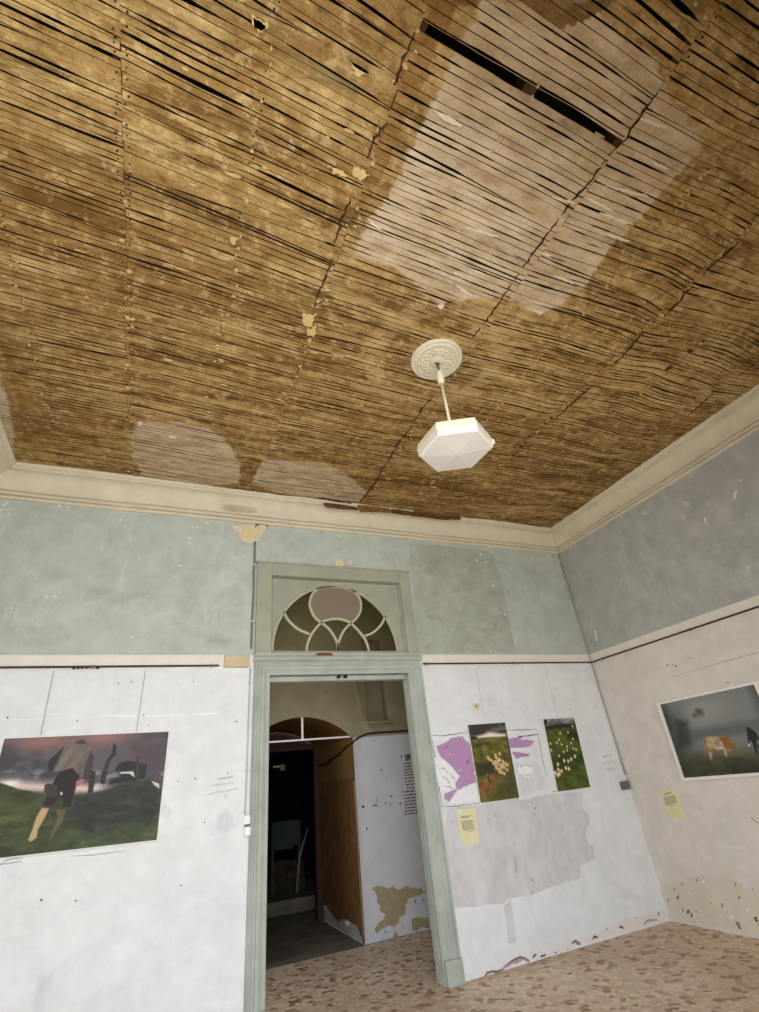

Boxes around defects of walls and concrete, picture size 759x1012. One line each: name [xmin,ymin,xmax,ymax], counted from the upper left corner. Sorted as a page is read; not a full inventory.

leakage [626,0,719,41]
crack [393,32,415,85]
leakage [259,0,461,302]
crack [366,123,388,159]
leakage [552,196,632,225]
leakage [605,185,649,198]
crack [313,198,351,308]
spalling [324,902,365,944]
spalling [372,885,429,938]
spalling [485,940,581,976]